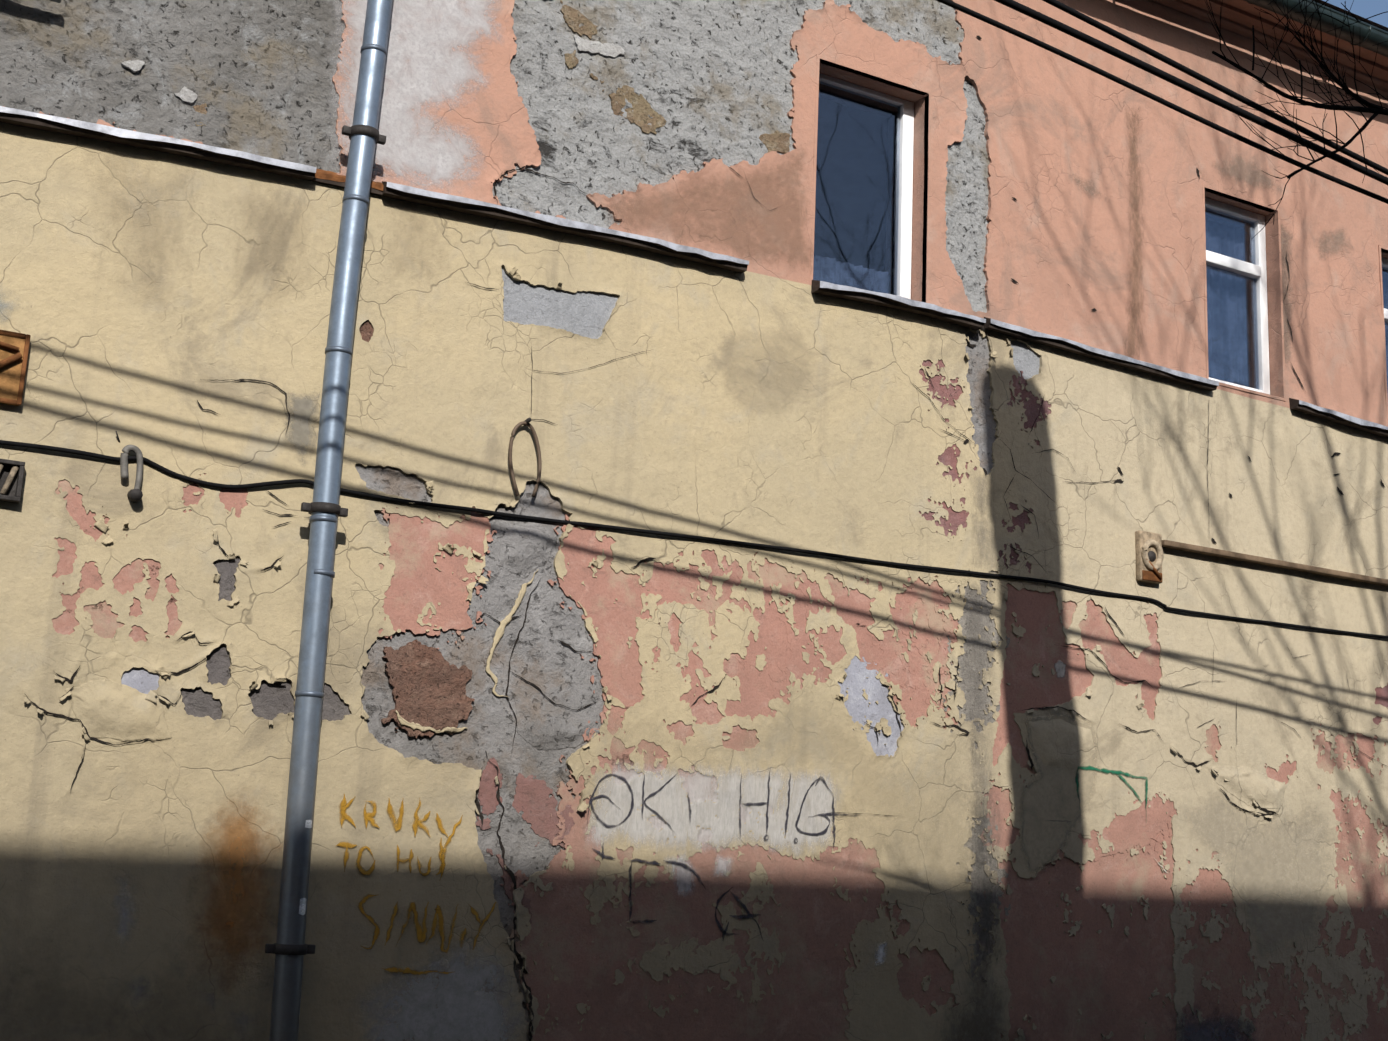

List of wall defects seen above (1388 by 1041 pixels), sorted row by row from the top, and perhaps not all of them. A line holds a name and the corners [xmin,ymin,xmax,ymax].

flaking render [0,0,345,173]
flaking render [492,0,1051,541]
crack [197,379,290,432]
flaking render [52,479,182,642]
flaking render [180,644,231,720]
flaking render [248,677,294,725]
crack [473,578,595,1041]
flaking render [321,464,1388,1041]
crack [864,662,970,738]
crack [1063,605,1214,692]
crack [1122,703,1278,818]
corrosion [208,819,264,957]